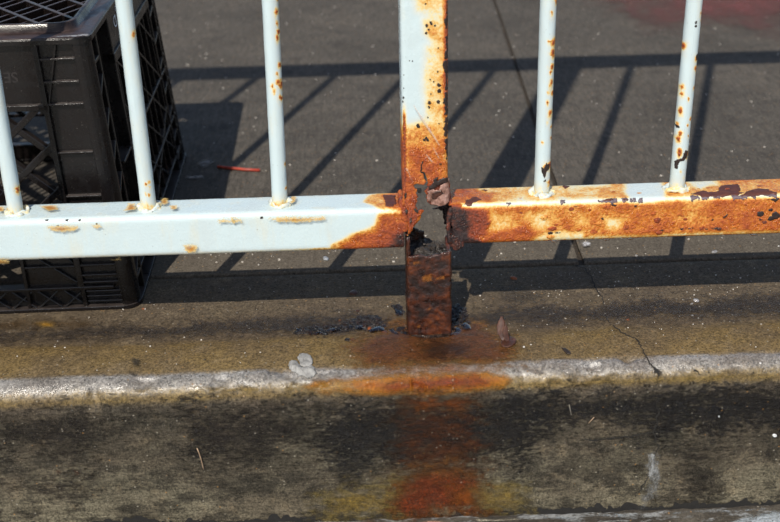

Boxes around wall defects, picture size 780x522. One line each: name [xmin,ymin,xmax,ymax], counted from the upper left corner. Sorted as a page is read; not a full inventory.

peeling [427,178,450,206]
peeling [692,184,780,221]
damp [0,404,145,460]
rust [307,316,526,522]
crack [93,265,780,522]
damp [174,379,780,500]